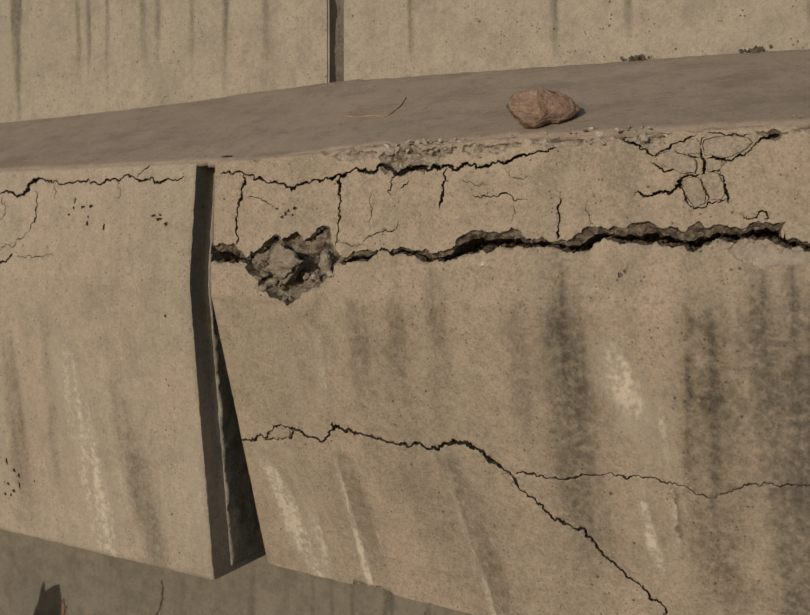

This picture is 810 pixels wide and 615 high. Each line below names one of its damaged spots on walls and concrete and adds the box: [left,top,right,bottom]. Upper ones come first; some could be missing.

crack [0,165,185,264]
spalling [245,228,344,306]
spalling [331,142,522,177]
crack [214,132,810,265]
spalling [756,129,810,141]
damp [602,342,670,459]
damp [257,454,331,578]
damp [336,464,374,586]
crack [242,422,810,615]
damp [640,490,666,576]